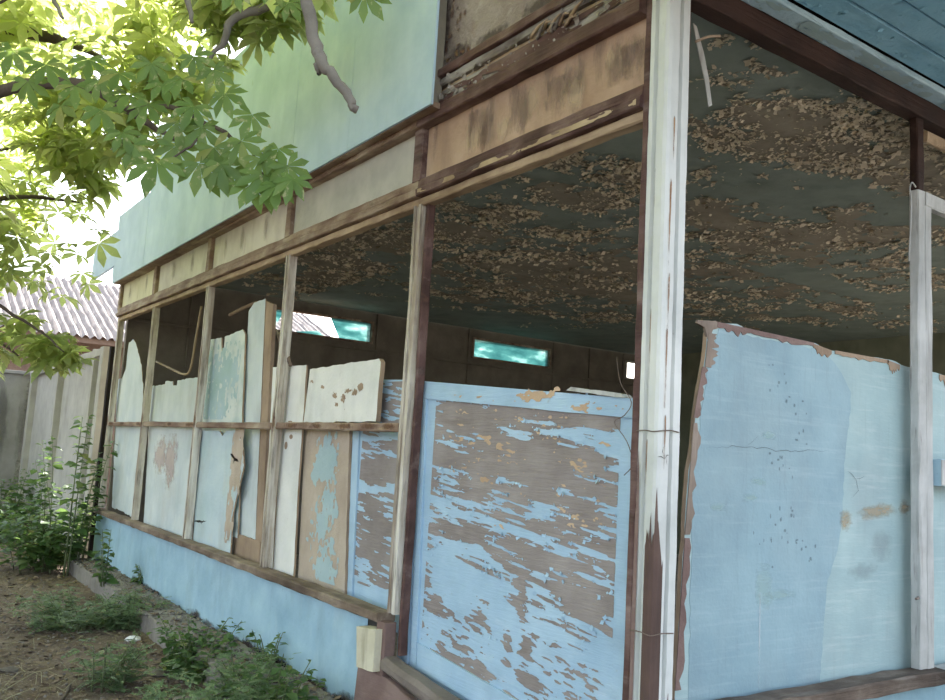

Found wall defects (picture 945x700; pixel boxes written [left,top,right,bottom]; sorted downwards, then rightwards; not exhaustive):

peeling [797,21,933,97]
peeling [472,110,613,171]
peeling [923,129,945,200]
peeling [242,219,413,302]
peeling [430,151,642,333]
peeling [931,225,945,248]
peeling [931,267,945,306]
peeling [310,380,363,410]
peeling [629,34,910,700]
peeling [306,431,339,585]
peeling [354,381,402,589]
peeling [421,386,623,700]